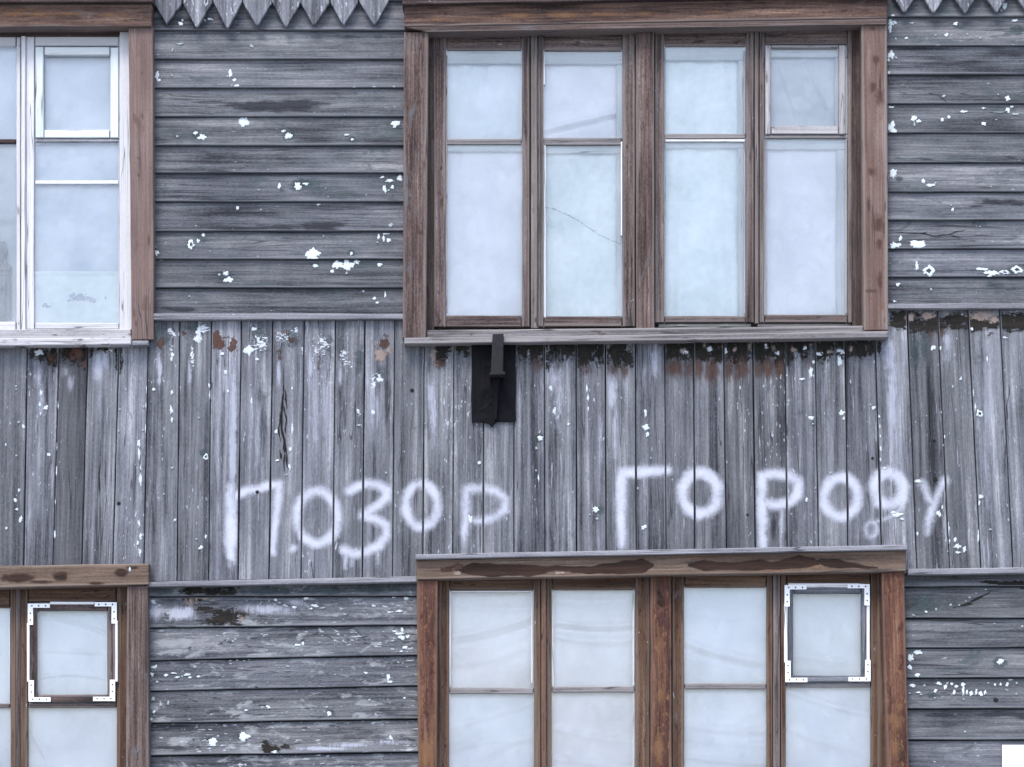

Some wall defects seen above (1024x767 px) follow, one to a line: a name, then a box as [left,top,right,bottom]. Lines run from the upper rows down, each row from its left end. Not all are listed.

peeling [305,247,321,268]
peeling [330,250,361,274]
peeling [976,265,1024,277]
leakage [93,351,108,380]
peeling [142,324,210,423]
peeling [243,327,385,390]
crack [278,385,288,470]
crack [952,592,990,608]
peeling [907,650,1018,700]